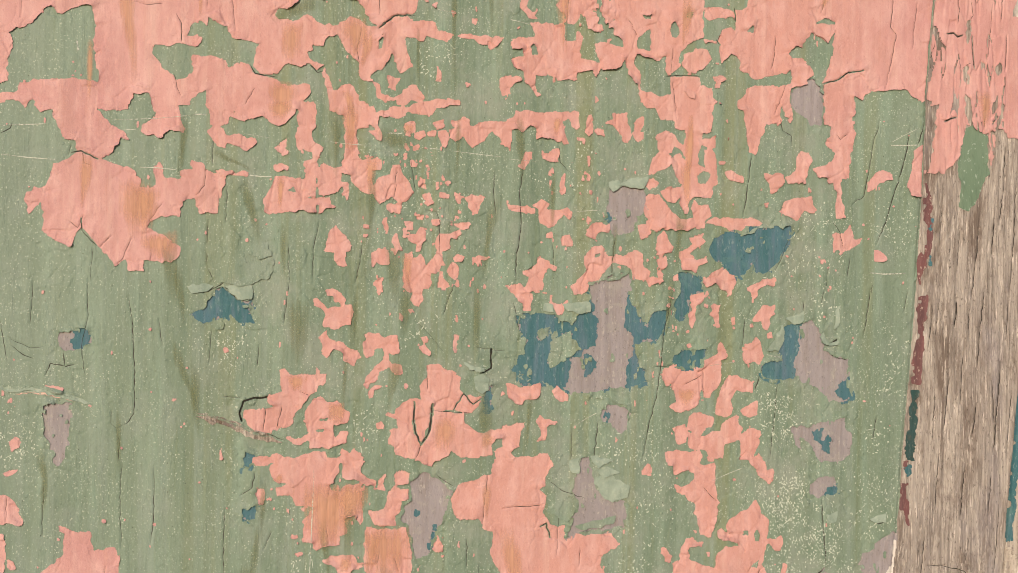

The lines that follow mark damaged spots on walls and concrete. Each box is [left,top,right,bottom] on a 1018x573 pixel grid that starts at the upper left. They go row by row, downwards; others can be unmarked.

peeling [0,0,644,330]
crack [878,117,956,240]
peeling [499,0,1018,573]
peeling [9,437,21,452]
peeling [42,385,73,466]
crack [225,396,285,441]
peeling [196,336,630,573]
peeling [0,495,23,573]
peeling [41,526,120,573]